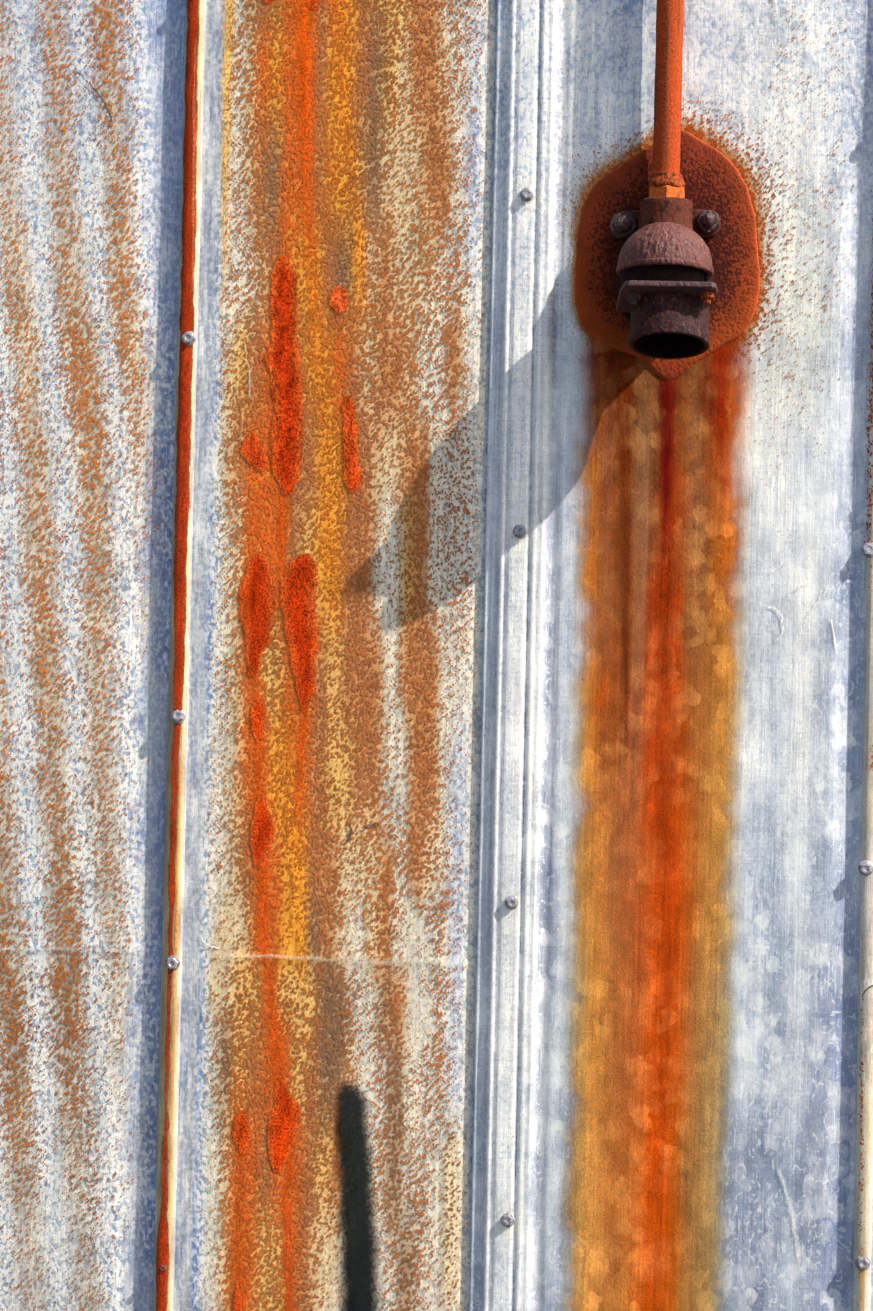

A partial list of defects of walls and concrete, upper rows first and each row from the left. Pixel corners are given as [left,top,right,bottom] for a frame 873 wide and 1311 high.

corrosion [0,0,200,1311]
corrosion [196,0,495,1311]
corrosion [527,0,873,1311]